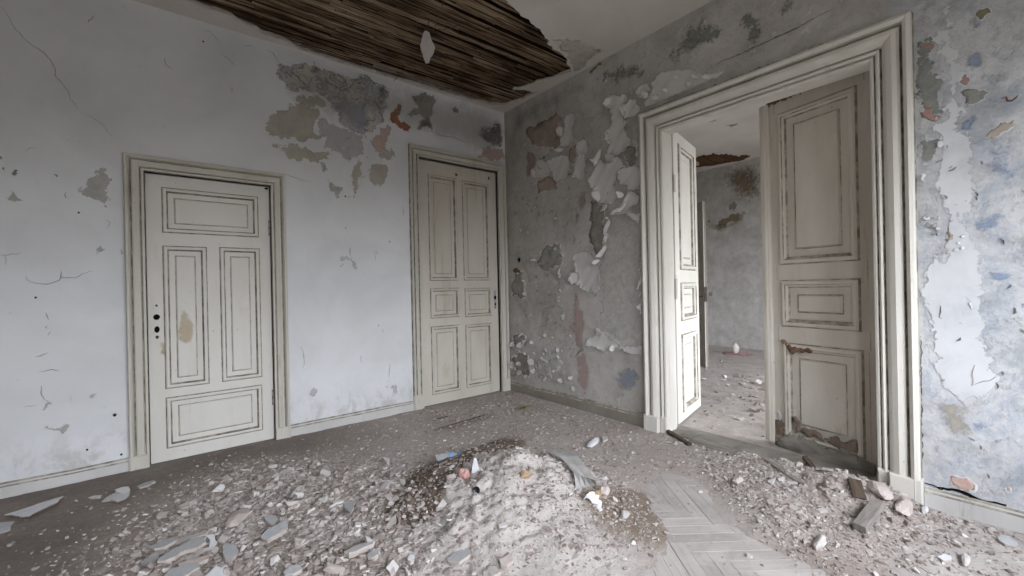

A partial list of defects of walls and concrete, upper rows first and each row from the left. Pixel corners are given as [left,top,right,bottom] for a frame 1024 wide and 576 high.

flaking render [187,0,604,198]
peeling [696,153,753,168]
peeling [78,168,112,208]
peeling [478,69,724,392]
peeling [708,201,740,227]
peeling [915,5,1005,402]
crack [5,252,84,284]
water stain [571,295,588,388]
peeling [949,475,978,493]